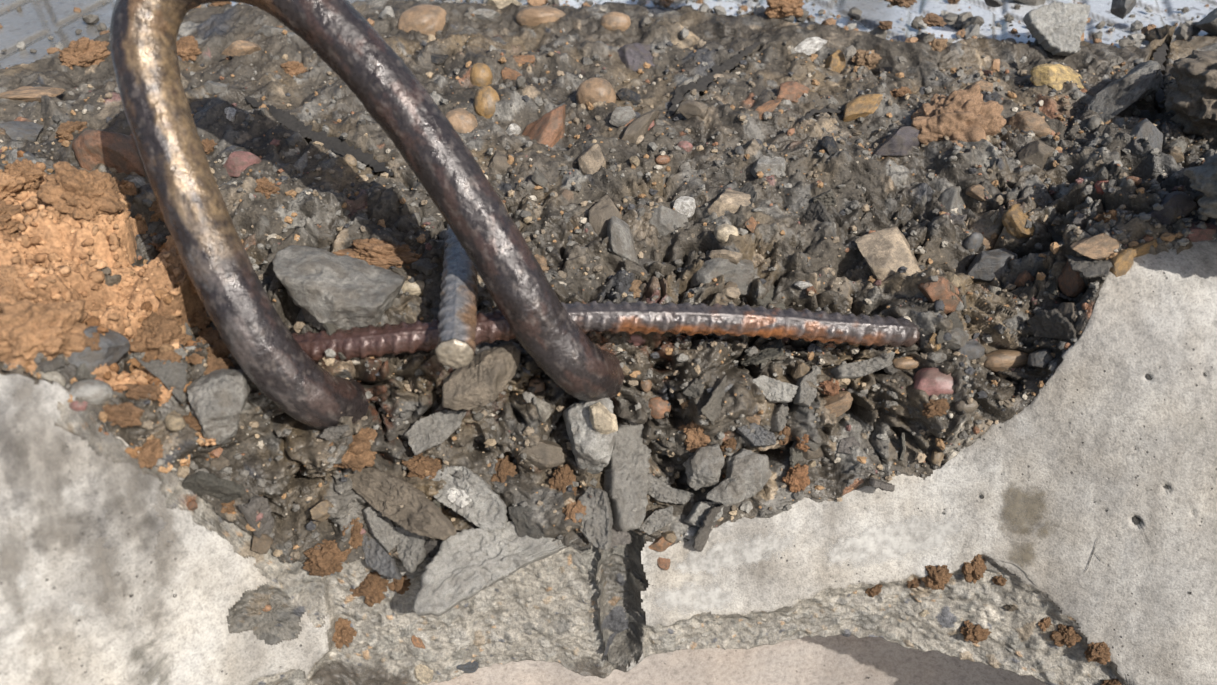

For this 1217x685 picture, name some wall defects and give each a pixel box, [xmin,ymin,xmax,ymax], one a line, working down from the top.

spalling [0,32,171,286]
spalling [176,4,448,335]
spalling [0,353,96,393]
damp [0,429,125,613]
spalling [54,318,652,685]
spalling [351,0,1217,685]